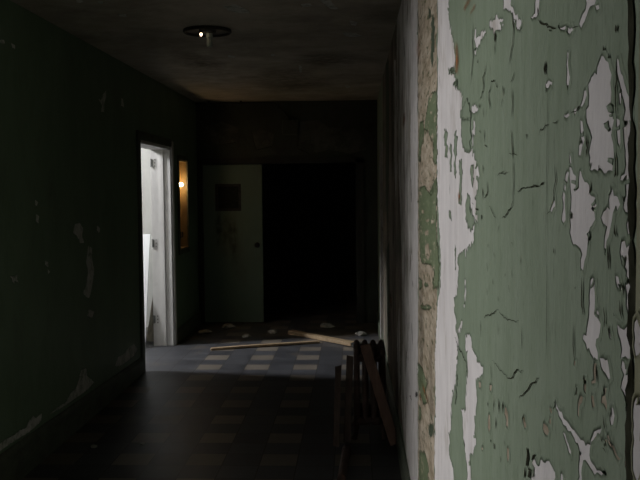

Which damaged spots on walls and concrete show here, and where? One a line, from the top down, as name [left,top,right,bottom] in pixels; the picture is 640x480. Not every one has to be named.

peeling [474,0,541,58]
peeling [558,0,602,39]
crack [470,13,514,118]
crack [472,167,547,228]
peeling [382,0,510,480]
peeling [542,48,640,480]
crack [490,360,538,397]
peeling [524,447,565,480]